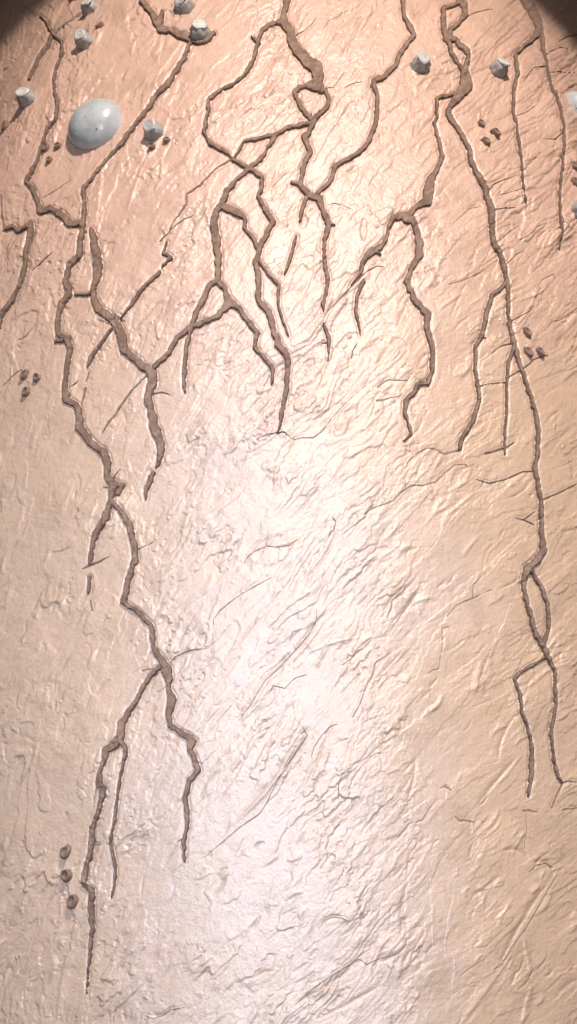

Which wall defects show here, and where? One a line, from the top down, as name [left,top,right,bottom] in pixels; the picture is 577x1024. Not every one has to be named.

crack [0,193,53,329]
crack [24,0,421,1005]
crack [397,783,484,838]
crack [335,0,577,807]